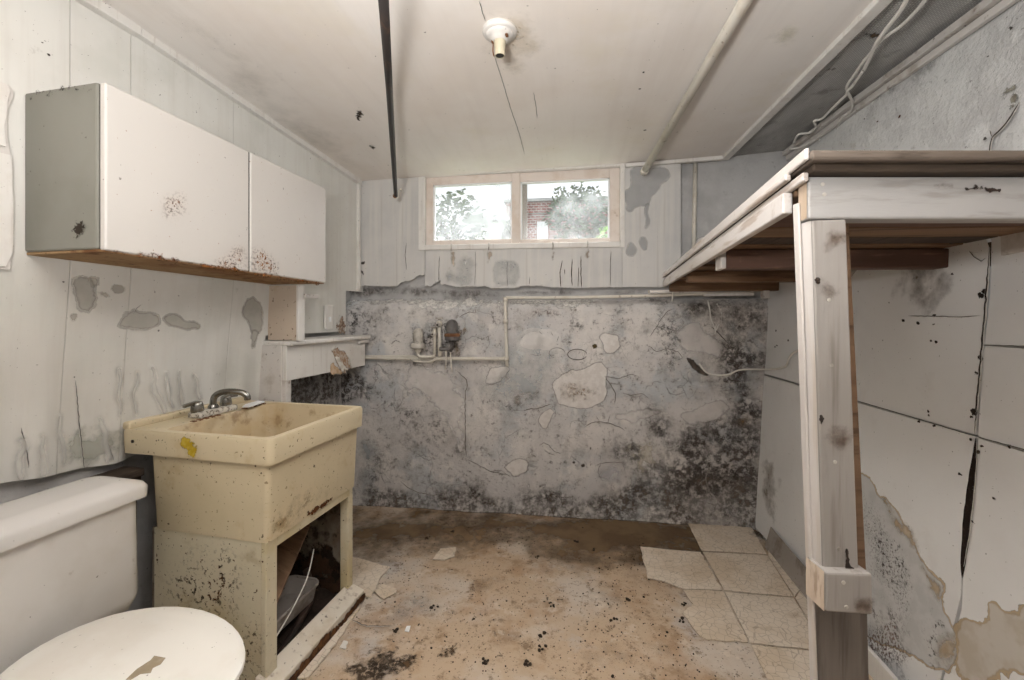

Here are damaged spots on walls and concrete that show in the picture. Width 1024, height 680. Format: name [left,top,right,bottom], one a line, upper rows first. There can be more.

peeling [330,316,352,375]
leakage [348,289,595,335]
crack [540,332,587,360]
crack [647,309,683,358]
mould [291,372,369,404]
crack [455,369,510,476]
flaking render [539,333,620,429]
crack [584,374,648,431]
leakage [353,341,767,567]